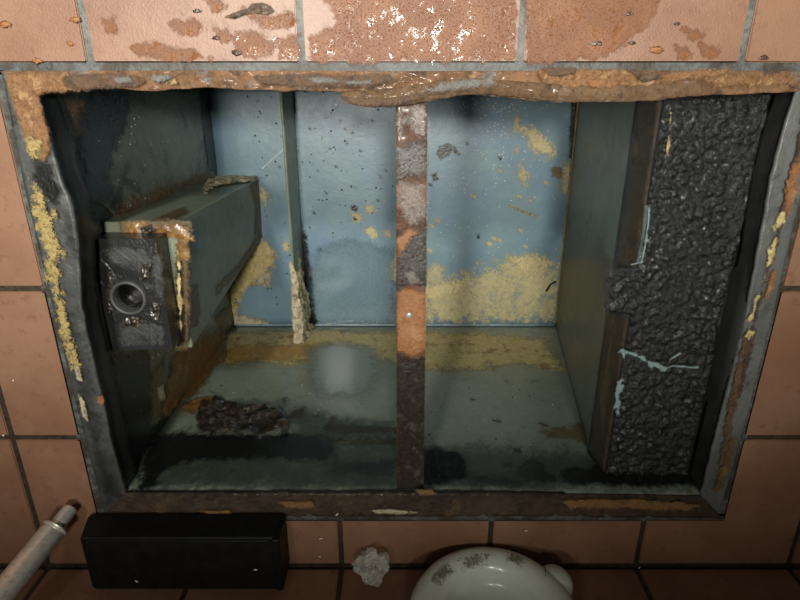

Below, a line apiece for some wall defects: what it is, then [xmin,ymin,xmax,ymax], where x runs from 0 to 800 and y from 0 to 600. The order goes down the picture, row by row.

corrosion [254,73,400,89]
corrosion [537,67,798,89]
corrosion [396,104,430,139]
damp [396,142,429,179]
corrosion [396,180,428,255]
corrosion [397,270,427,357]
damp [110,220,567,491]
damp [505,459,692,488]
corrosion [280,500,315,509]
corrosion [563,498,702,512]